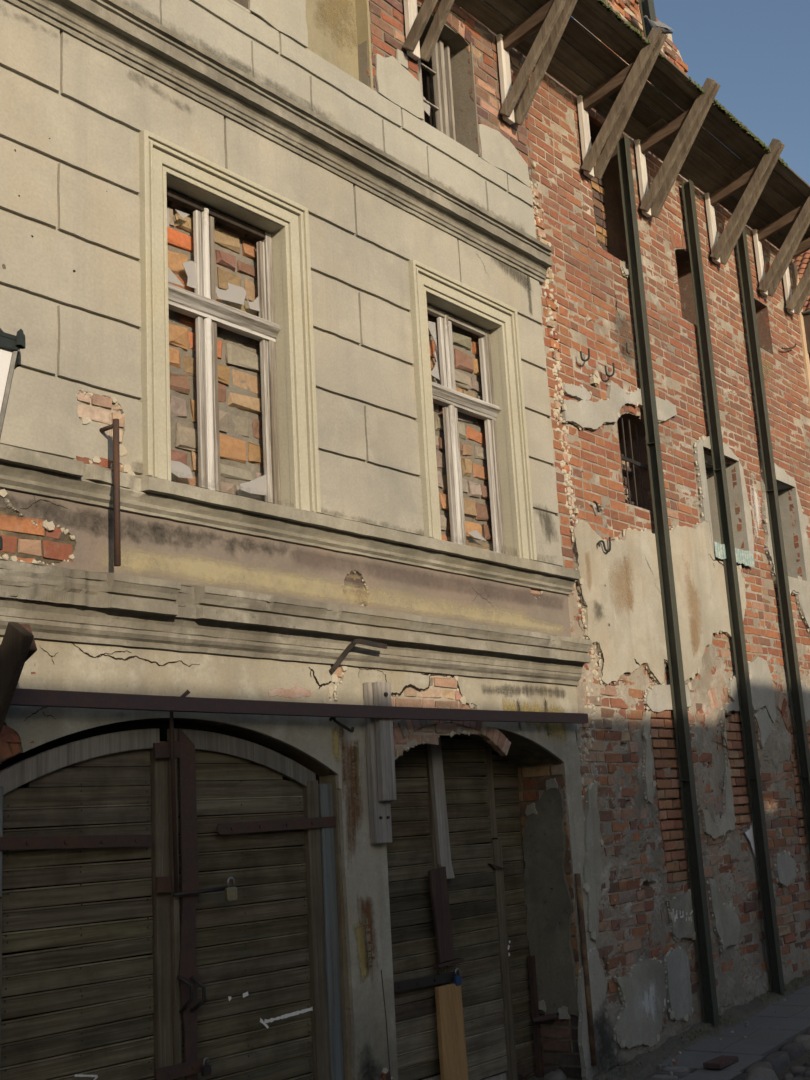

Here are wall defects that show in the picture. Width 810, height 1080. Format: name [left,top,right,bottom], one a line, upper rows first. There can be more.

spalling [73,389,136,475]
peeling [655,396,677,423]
spalling [0,489,75,566]
peeling [544,267,673,806]
peeling [669,436,810,707]
crack [40,642,200,667]
flaking render [0,724,34,764]
corrosion [340,727,360,846]
spalling [391,673,511,759]
peeling [700,656,777,840]
corrosion [362,900,375,974]
peeling [522,778,696,1080]